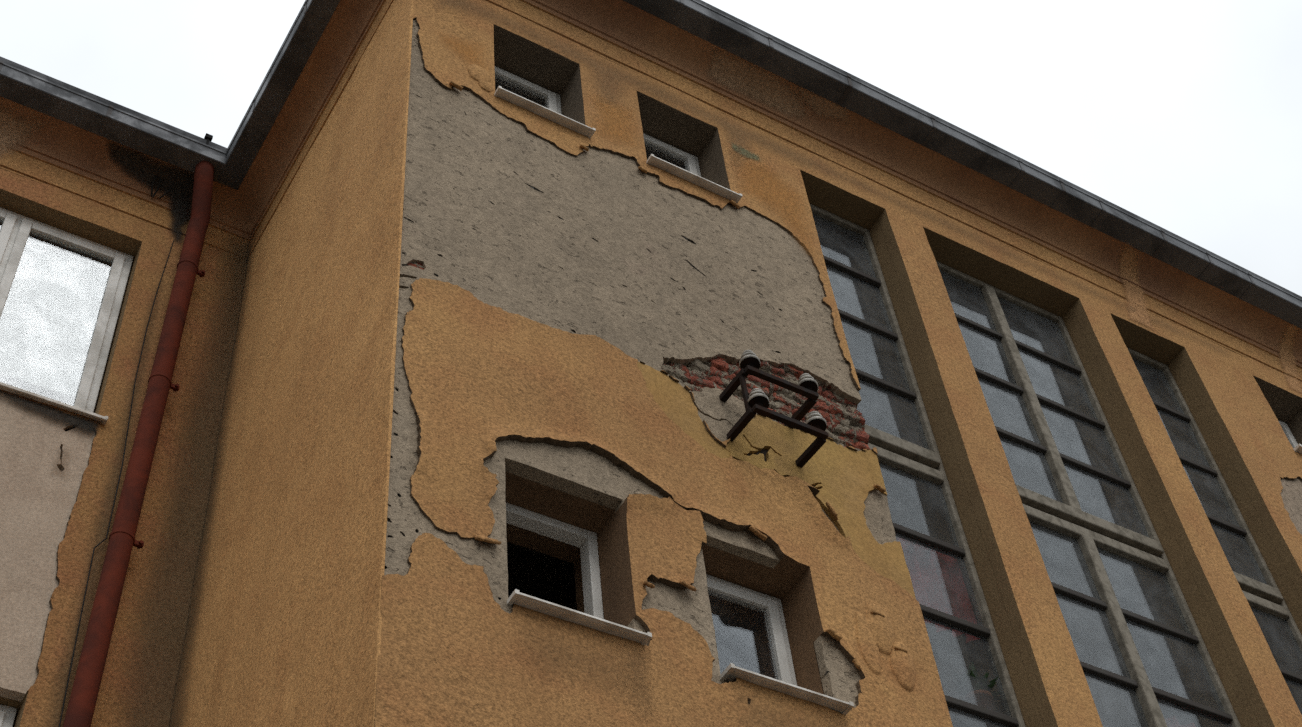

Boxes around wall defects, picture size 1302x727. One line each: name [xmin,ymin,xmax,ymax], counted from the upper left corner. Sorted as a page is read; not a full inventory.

leakage [109,144,194,241]
flaking render [384,19,916,614]
flaking render [0,392,96,702]
flaking render [1280,478,1302,535]